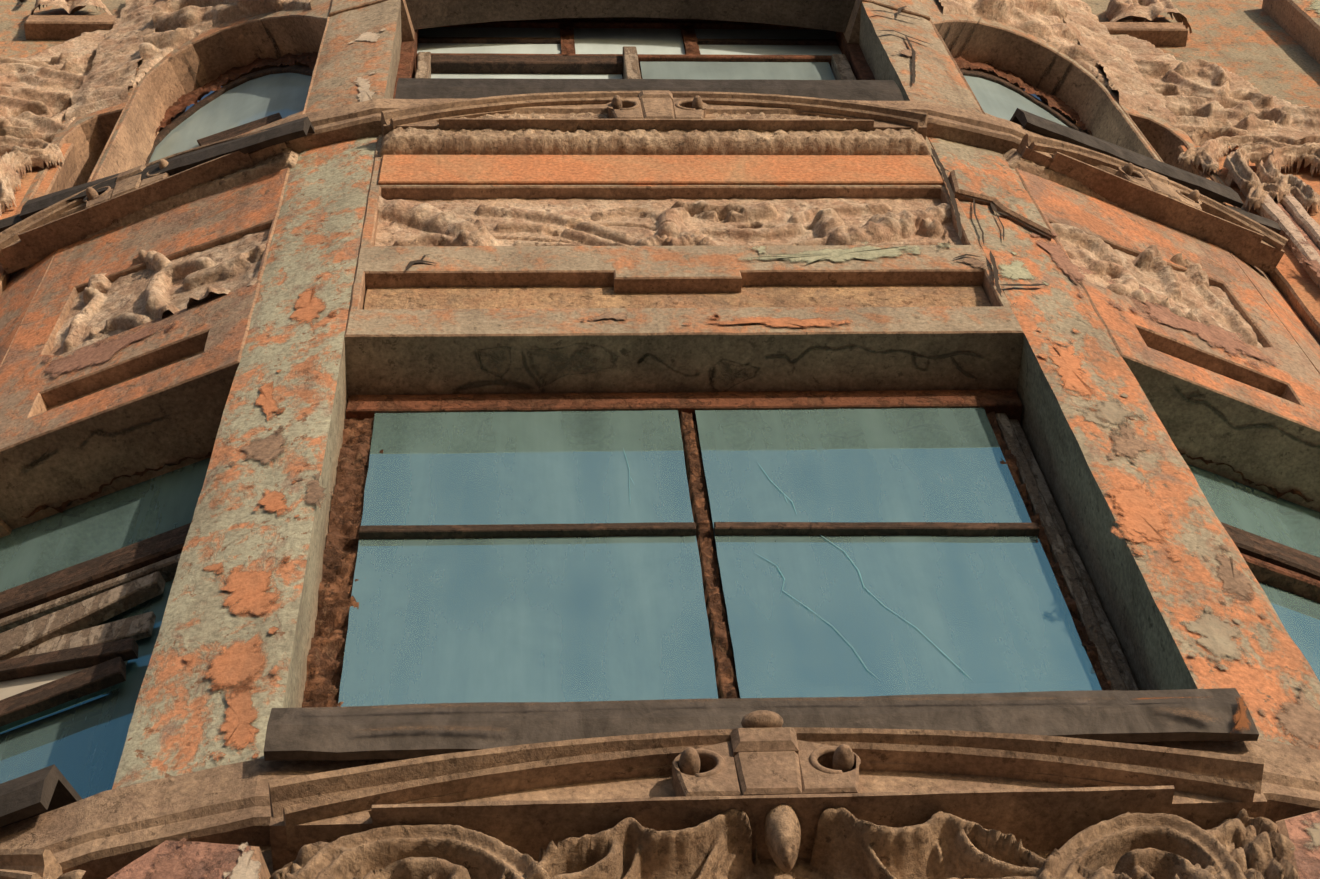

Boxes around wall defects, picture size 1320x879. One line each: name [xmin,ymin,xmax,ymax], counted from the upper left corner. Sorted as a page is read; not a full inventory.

crack [870,6,933,84]
peeling [741,241,921,264]
crack [931,147,1051,297]
peeling [937,243,1049,285]
peeling [684,313,852,328]
flaking render [230,369,289,466]
peeling [1037,327,1150,464]
peeling [253,471,333,517]
peeling [1105,482,1181,561]
peeling [203,555,292,615]
flaking render [1183,543,1266,670]
peeling [205,627,283,761]